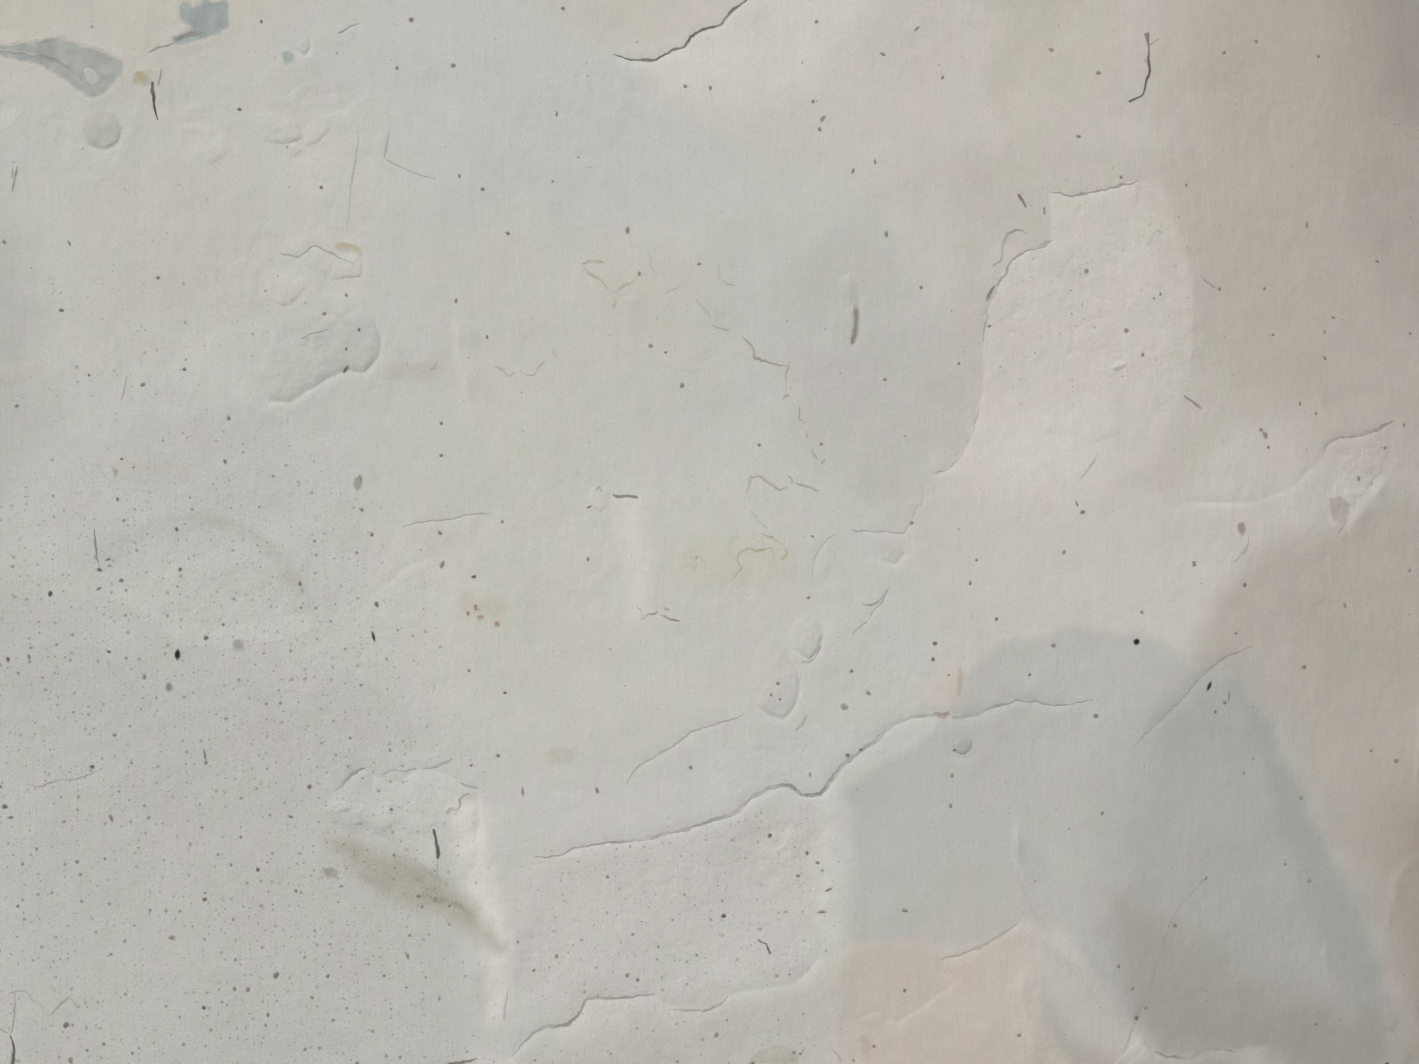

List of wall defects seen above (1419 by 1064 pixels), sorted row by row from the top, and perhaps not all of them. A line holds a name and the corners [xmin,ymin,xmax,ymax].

peeling [0,0,242,113]
peeling [1328,495,1351,523]
flaking render [319,741,494,811]
crack [0,975,78,1064]
leakage [1136,981,1396,1064]